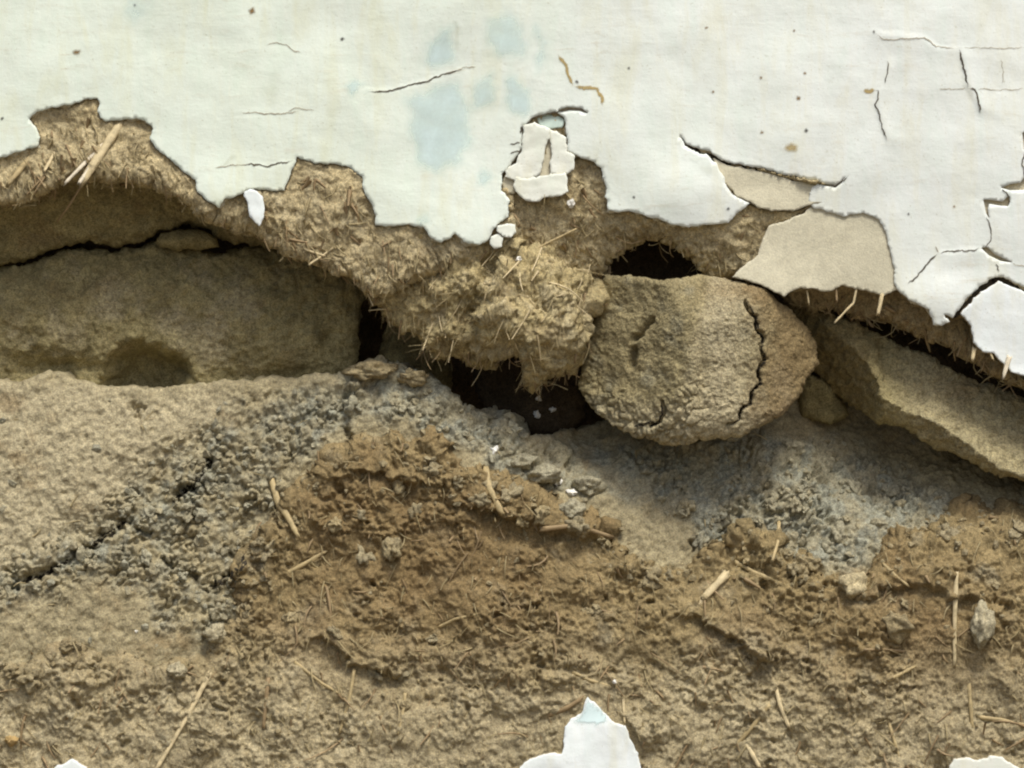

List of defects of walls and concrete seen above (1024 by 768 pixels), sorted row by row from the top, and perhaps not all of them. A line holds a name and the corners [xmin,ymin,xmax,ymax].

crack [217,160,289,168]
crack [247,107,312,115]
crack [370,66,473,92]
crack [683,140,793,181]
crack [874,36,1022,139]
spalling [0,99,1024,397]
crack [909,218,1024,318]
crack [731,301,766,425]